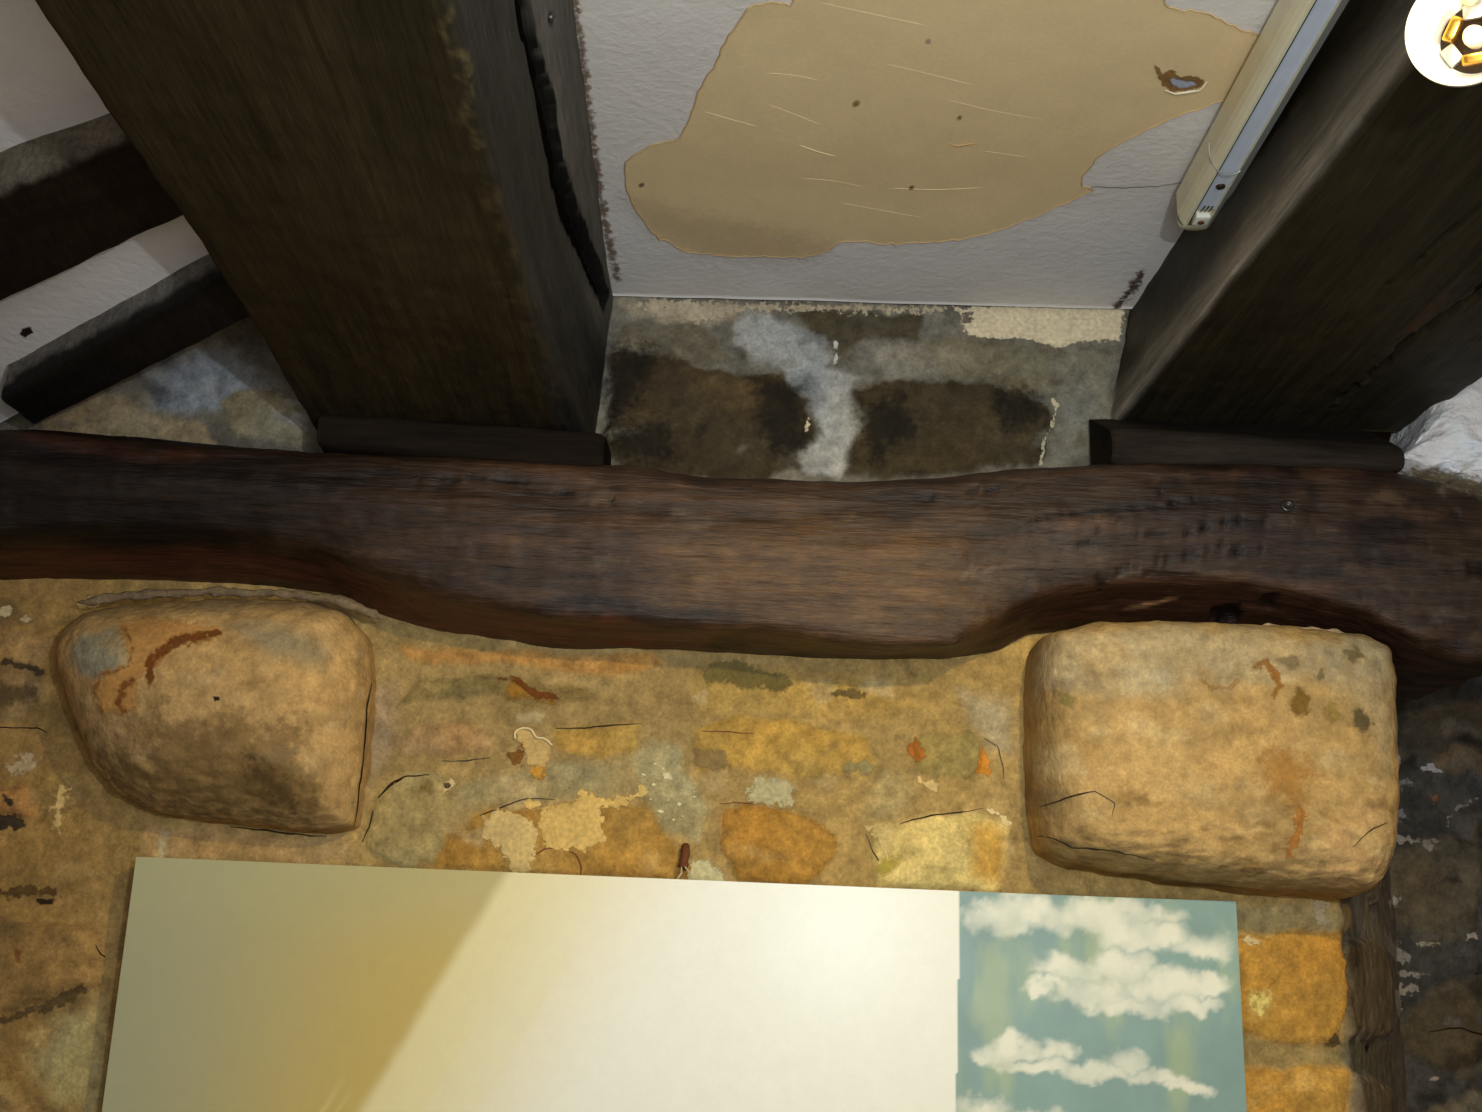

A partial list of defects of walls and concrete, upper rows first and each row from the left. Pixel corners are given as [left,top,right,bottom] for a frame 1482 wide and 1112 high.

peeling [624,0,1261,258]
leakage [621,297,956,327]
leakage [1039,398,1060,466]
rust [93,617,222,716]